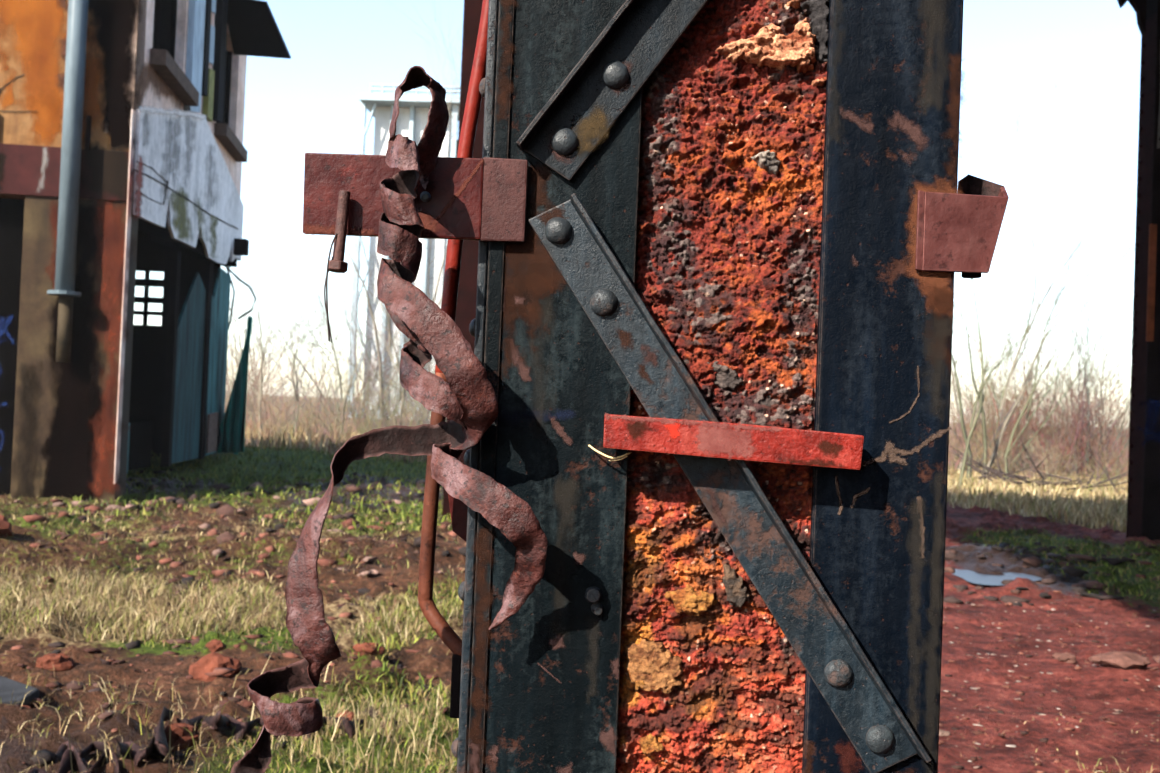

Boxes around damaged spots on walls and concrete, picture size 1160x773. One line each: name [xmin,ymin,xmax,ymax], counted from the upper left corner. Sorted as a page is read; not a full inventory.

corrosion [0,0,67,145]
corrosion [82,22,103,144]
spalling [715,0,830,87]
corrosion [46,202,58,288]
leakage [12,0,181,501]
leakage [171,189,218,258]
corrosion [303,224,373,234]
corrosion [420,160,483,239]
corrosion [907,56,963,363]
corrosion [90,156,144,496]
corrosion [619,331,657,382]
corrosion [468,528,493,773]